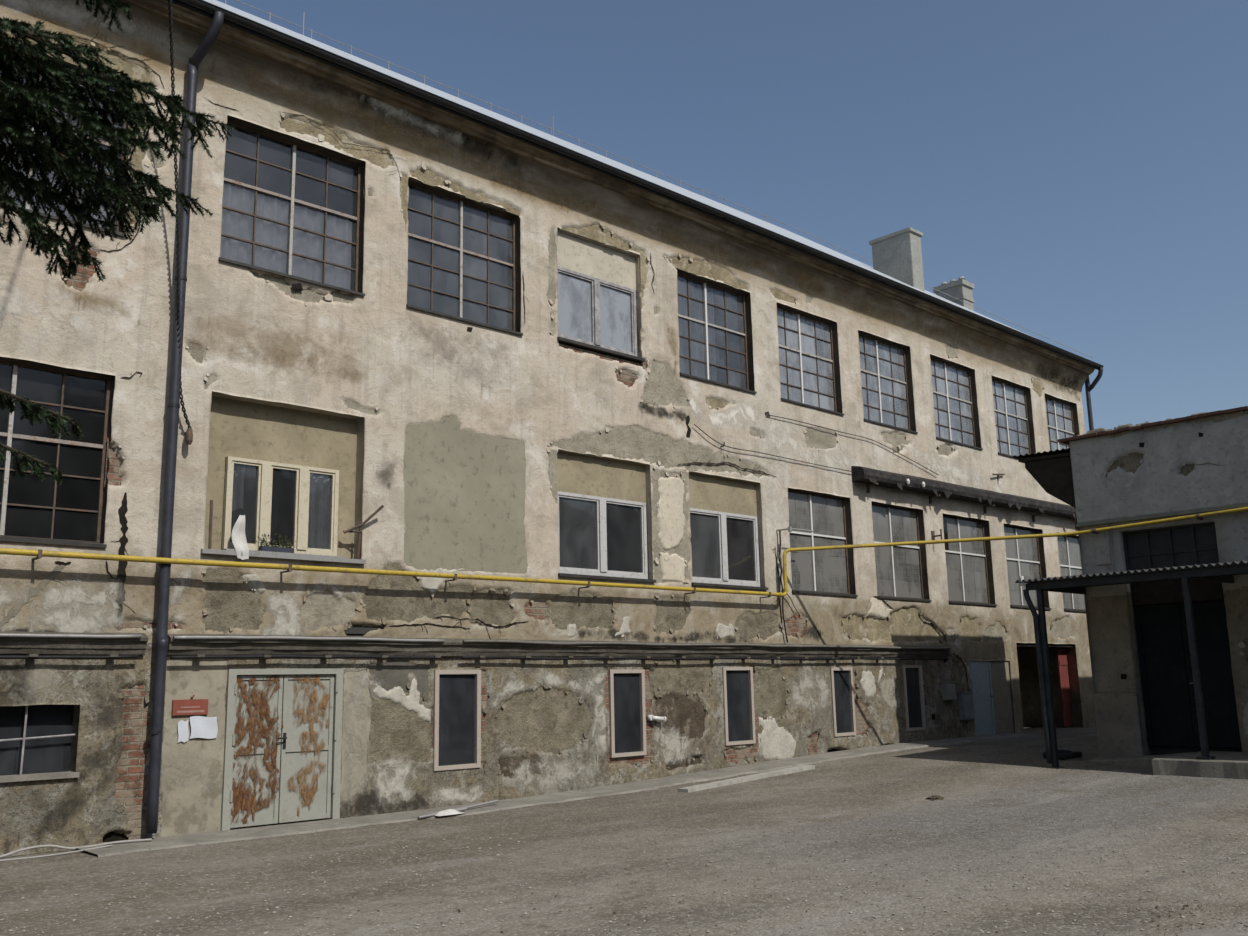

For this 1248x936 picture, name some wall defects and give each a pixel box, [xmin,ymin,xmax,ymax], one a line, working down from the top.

flaking render [60,244,97,292]
spalling [546,222,855,634]
spalling [1077,410,1248,483]
crack [106,492,135,617]
peeling [30,579,184,633]
spalling [170,563,630,641]
spalling [716,612,783,640]
rust [231,675,330,824]
spalling [351,659,433,746]
peeling [724,666,841,764]